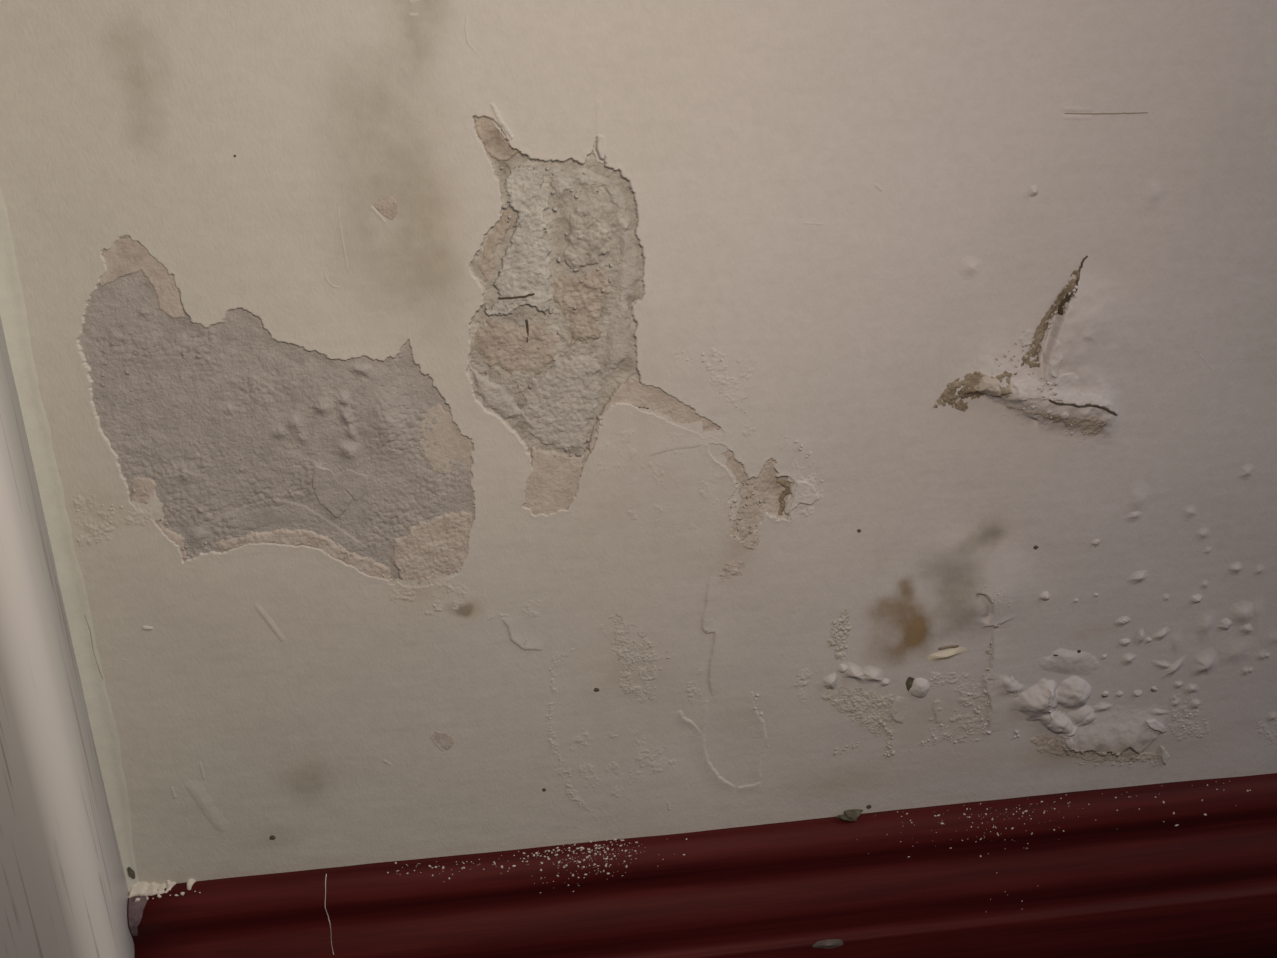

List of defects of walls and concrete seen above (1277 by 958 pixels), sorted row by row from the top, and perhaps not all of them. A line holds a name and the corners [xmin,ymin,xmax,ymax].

peeling [66,103,820,597]
leakage [900,588,927,648]
leakage [821,685,897,757]